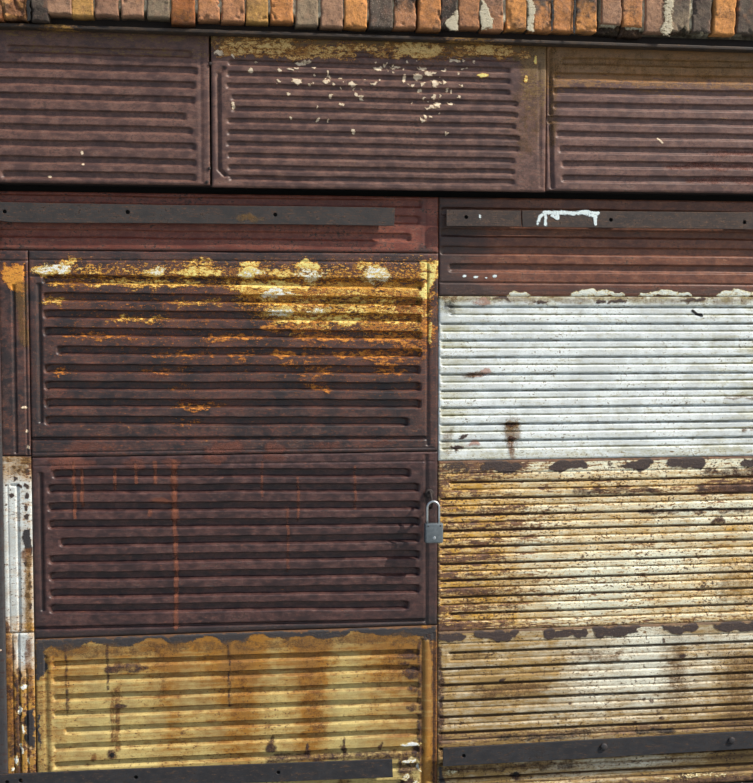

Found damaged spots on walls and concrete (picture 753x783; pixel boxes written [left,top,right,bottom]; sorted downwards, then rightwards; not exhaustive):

peeling [276,57,475,123]
peeling [476,288,753,304]
peeling [30,253,454,429]
corrosion [505,422,521,458]
corrosion [48,443,106,519]
corrosion [126,458,180,629]
corrosion [638,507,750,524]
corrosion [698,466,753,492]
corrosion [5,557,34,773]
corrosion [105,644,148,760]
corrosion [266,634,445,783]
peeling [397,741,423,783]